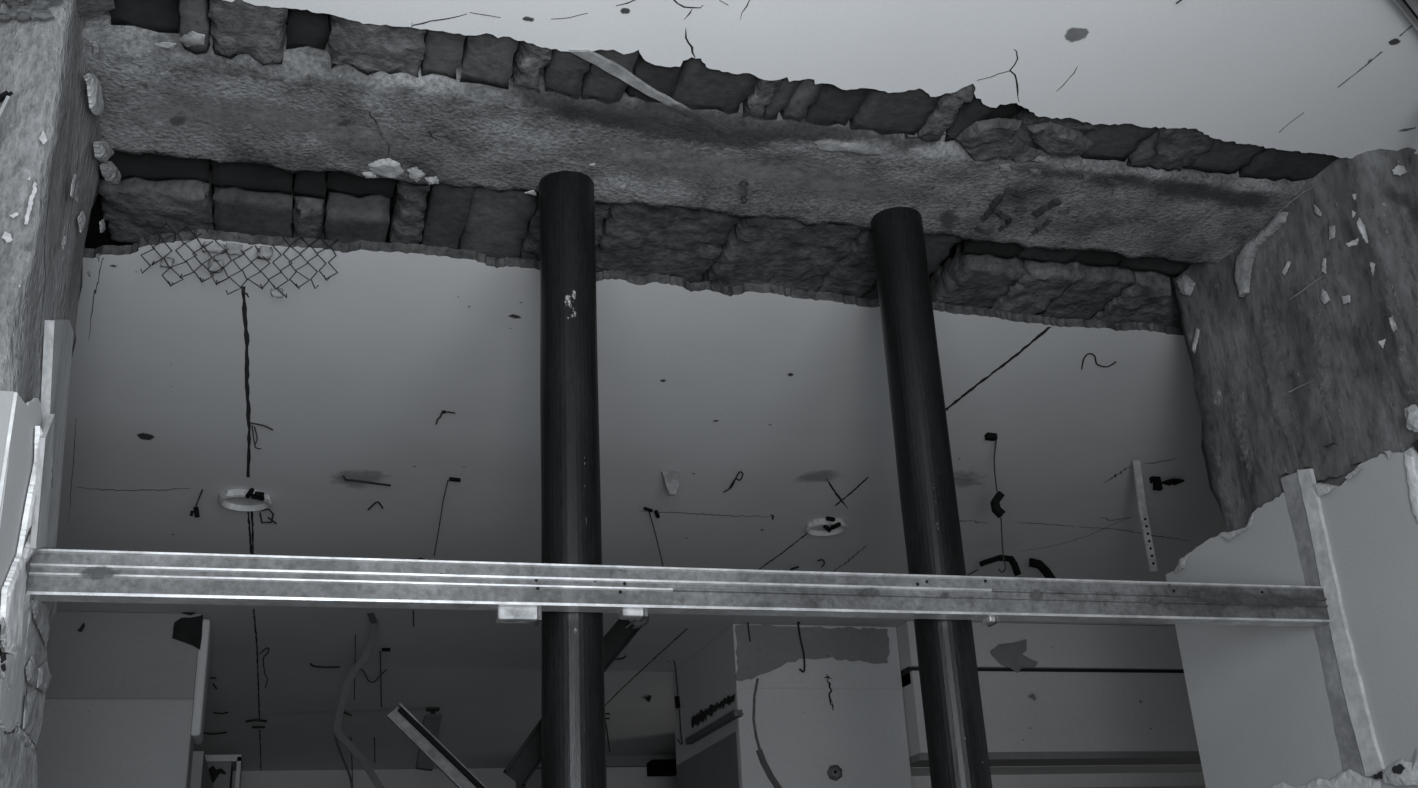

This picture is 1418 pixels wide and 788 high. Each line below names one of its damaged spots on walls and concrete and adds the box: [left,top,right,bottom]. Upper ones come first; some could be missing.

crack [411,12,501,30]
crack [673,0,750,57]
peeling [83,73,104,115]
crack [979,49,1019,101]
peeling [93,141,121,184]
spalling [362,158,439,185]
spalling [956,118,1095,175]
spalling [2,177,37,243]
peeling [1234,212,1288,297]
flaking render [1384,404,1418,521]
peeling [0,426,57,788]
flaking render [1271,749,1418,788]